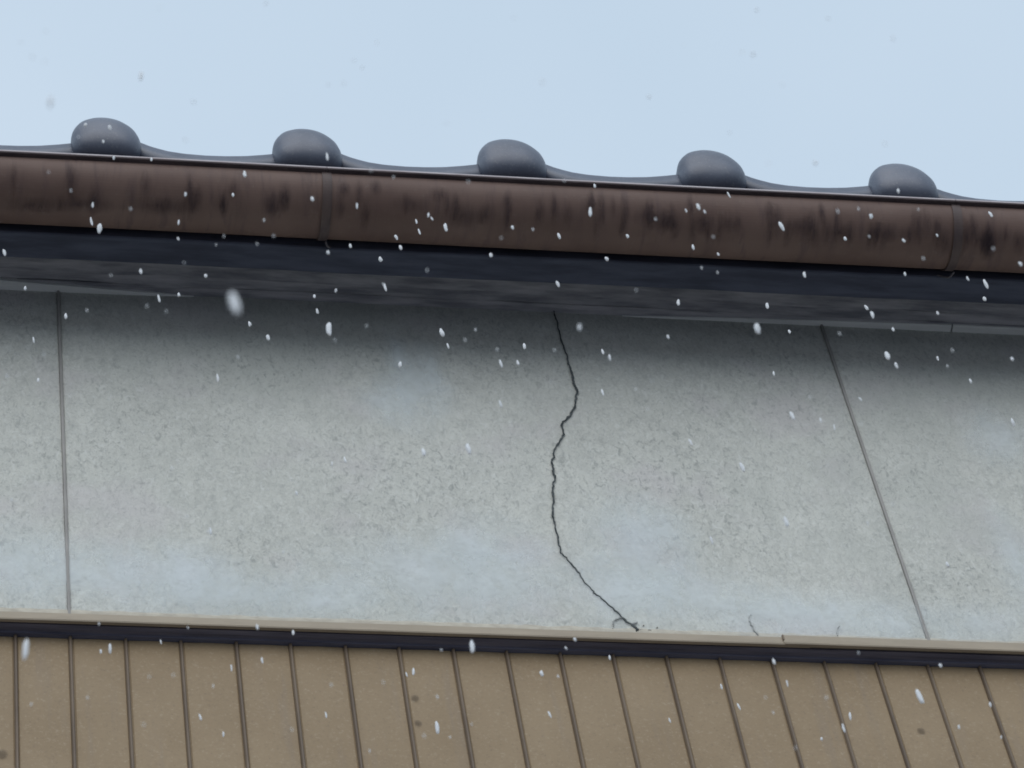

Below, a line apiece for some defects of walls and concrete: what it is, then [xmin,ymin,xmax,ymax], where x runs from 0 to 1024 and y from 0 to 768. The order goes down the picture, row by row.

crack [551,311,639,632]